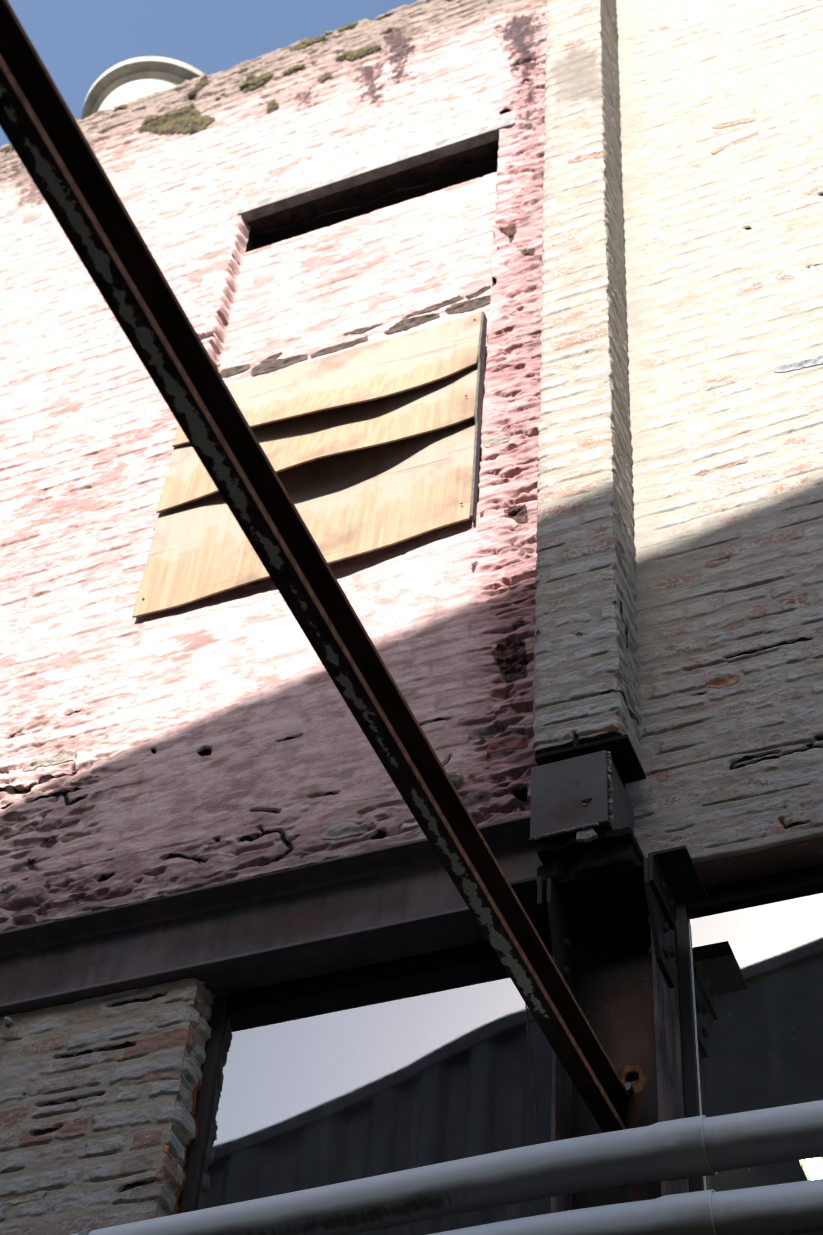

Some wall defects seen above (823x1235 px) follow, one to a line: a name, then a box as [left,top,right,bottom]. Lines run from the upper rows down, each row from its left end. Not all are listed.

damp [348,25,417,104]
damp [495,10,547,138]
crack [0,770,87,805]
crack [165,854,205,864]
crack [237,810,293,867]
corrosion [621,1063,648,1126]